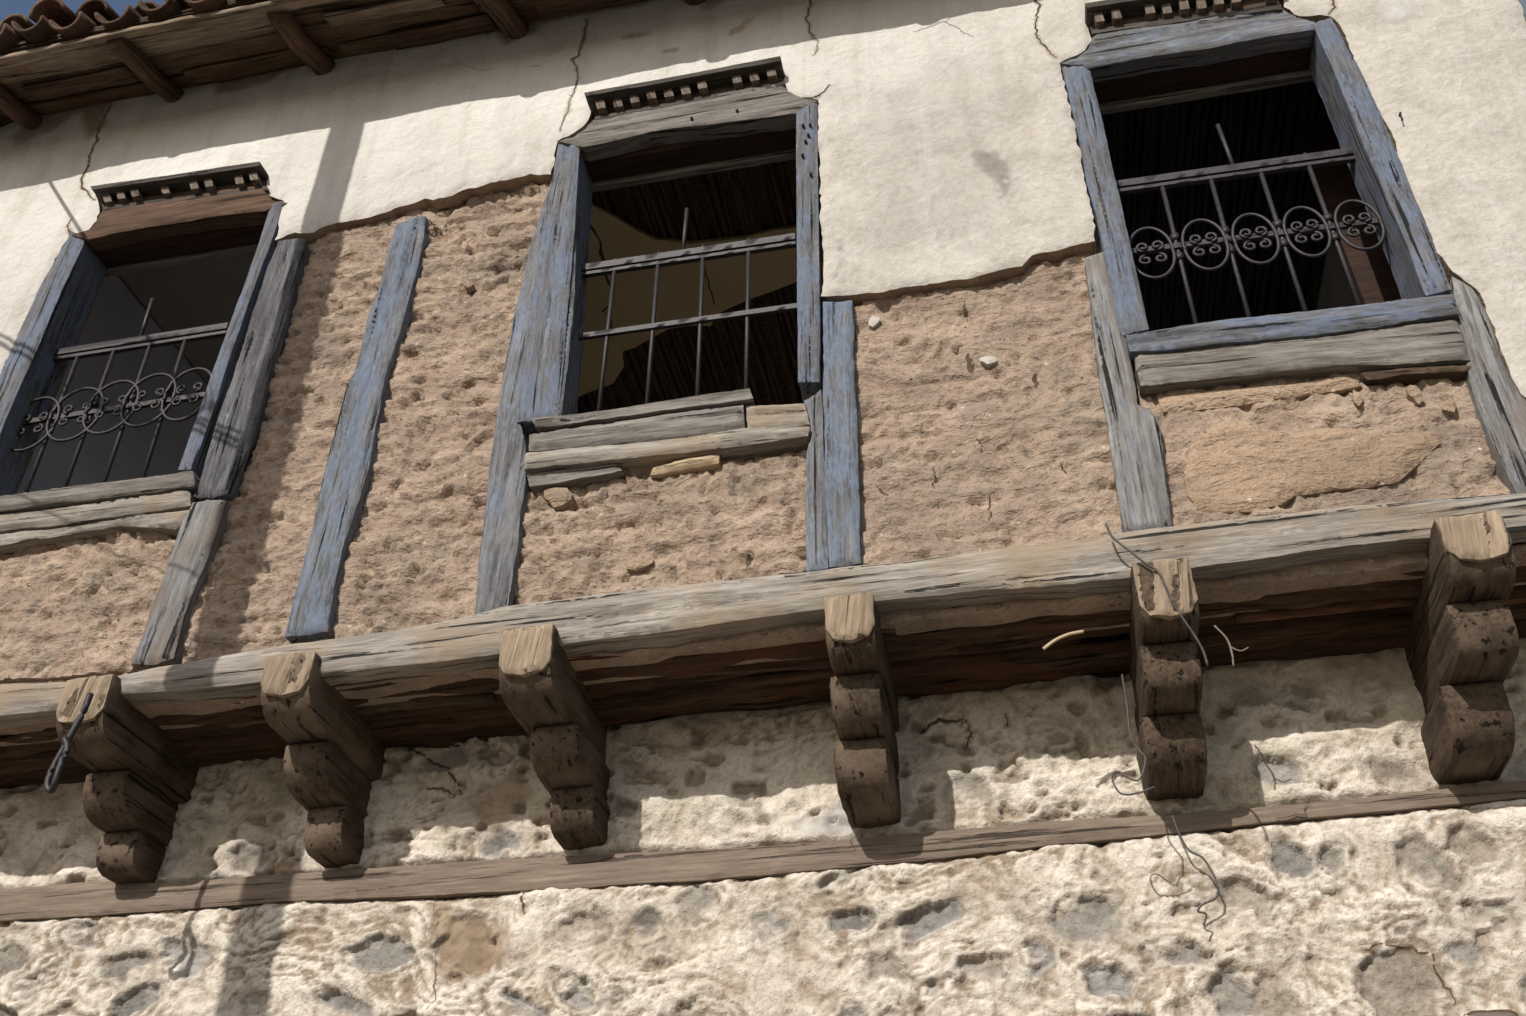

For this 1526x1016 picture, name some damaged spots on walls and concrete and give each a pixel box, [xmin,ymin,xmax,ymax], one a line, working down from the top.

crack [560,19,588,130]
crack [803,0,830,99]
crack [1034,0,1057,58]
crack [67,106,111,235]
spalling [182,182,551,664]
spalling [853,242,1123,565]
spalling [1136,373,1510,527]
spalling [514,450,807,605]
spalling [0,530,176,684]